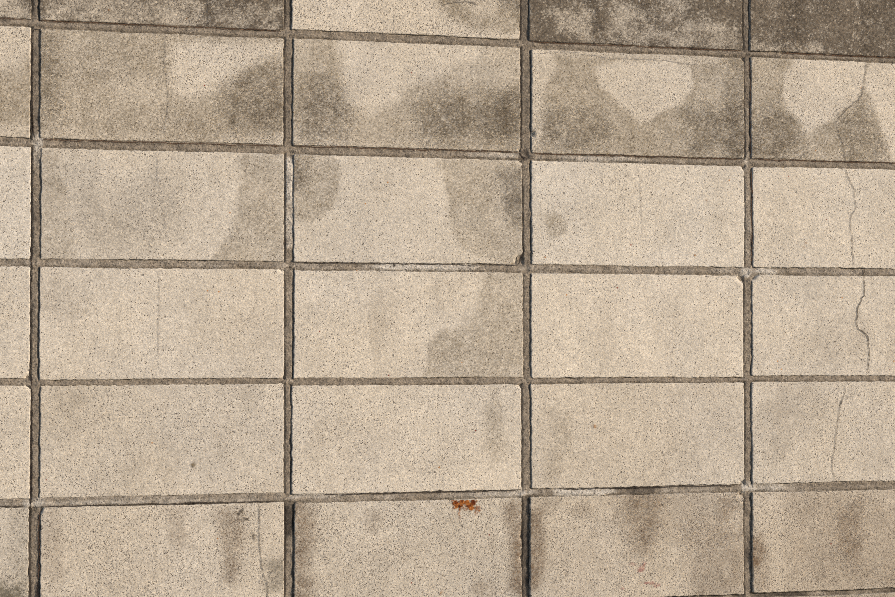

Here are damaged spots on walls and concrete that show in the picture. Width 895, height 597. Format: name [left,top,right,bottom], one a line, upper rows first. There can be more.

damp [183,0,284,30]
damp [502,0,895,68]
damp [741,90,881,161]
crack [300,0,895,369]
crack [0,0,524,597]
crack [832,383,850,481]
corrosion [451,500,480,514]